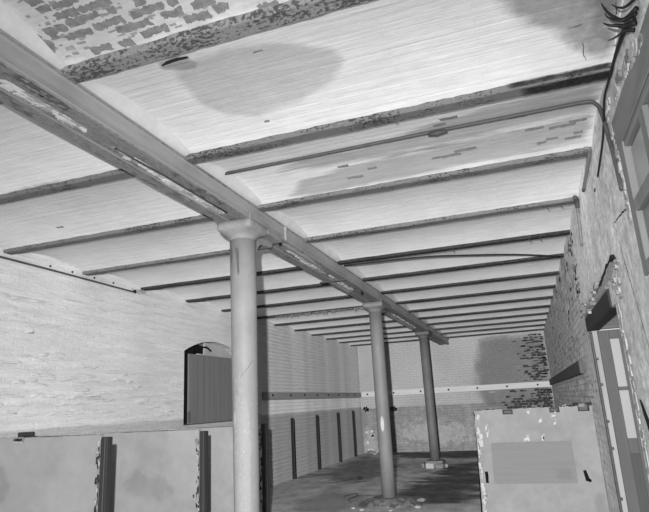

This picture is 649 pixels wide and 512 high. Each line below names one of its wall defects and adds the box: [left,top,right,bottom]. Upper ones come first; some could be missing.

peeling [17,0,229,58]
flaking render [162,56,189,67]
peeling [0,79,87,133]
flaking render [513,231,649,474]